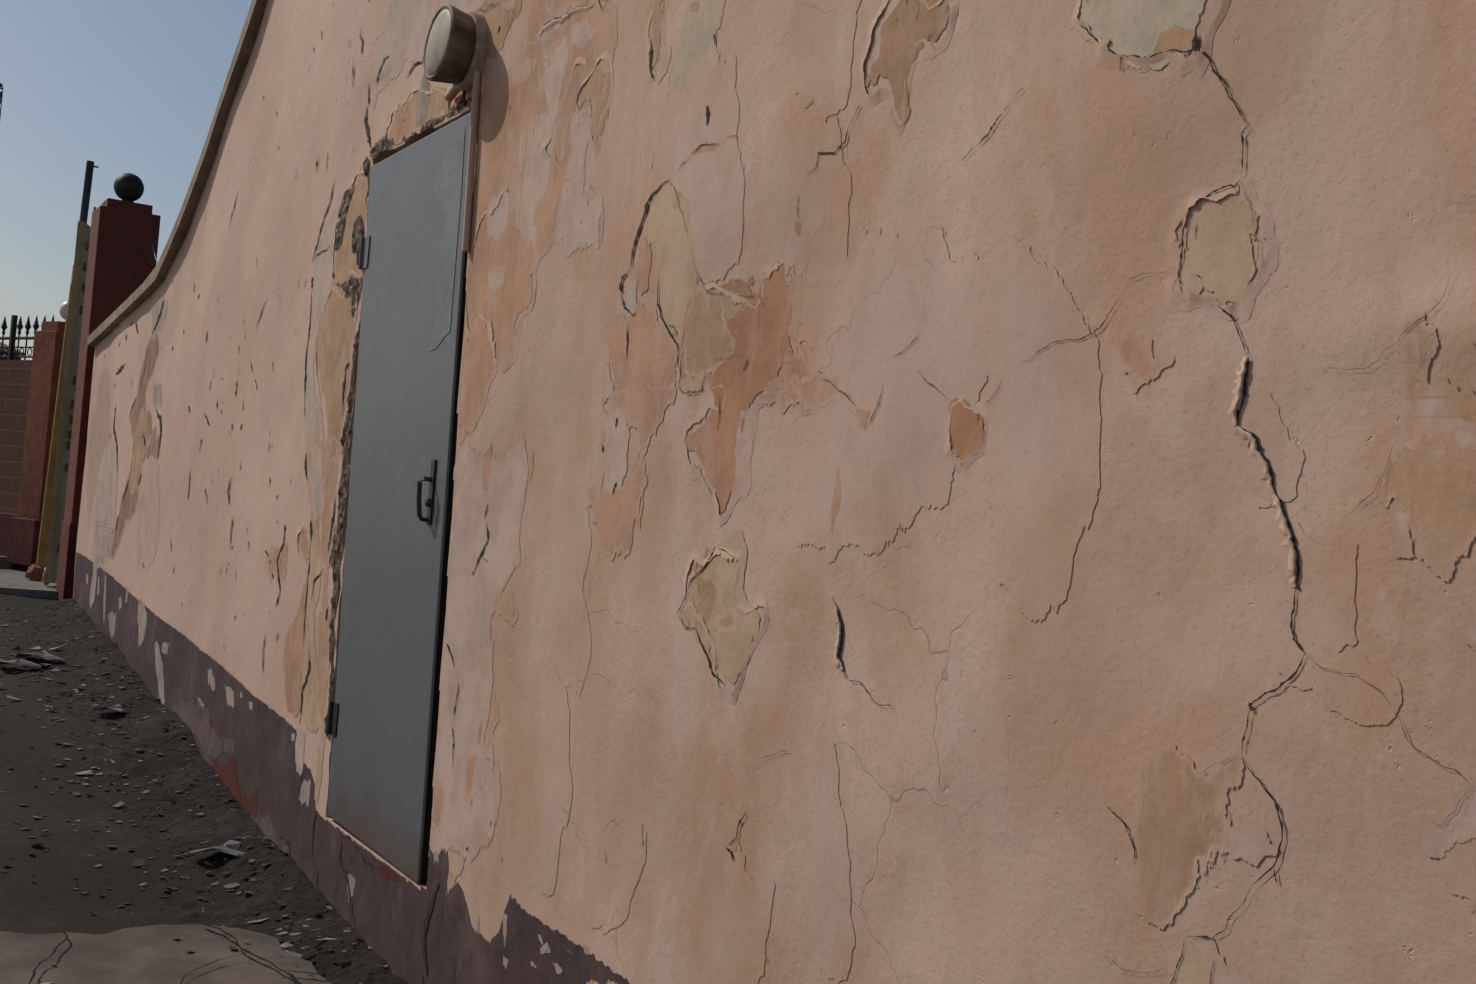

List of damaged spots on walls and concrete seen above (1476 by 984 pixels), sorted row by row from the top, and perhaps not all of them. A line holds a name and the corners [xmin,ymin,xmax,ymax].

peeling [645,0,668,84]
peeling [858,0,959,135]
peeling [1069,0,1231,77]
crack [1195,35,1248,178]
peeling [283,0,618,888]
peeling [598,180,883,705]
peeling [917,371,1002,474]
peeling [86,574,128,637]
crack [1185,305,1358,940]
peeling [96,704,126,712]
peeling [155,641,290,857]
peeling [530,934,589,974]